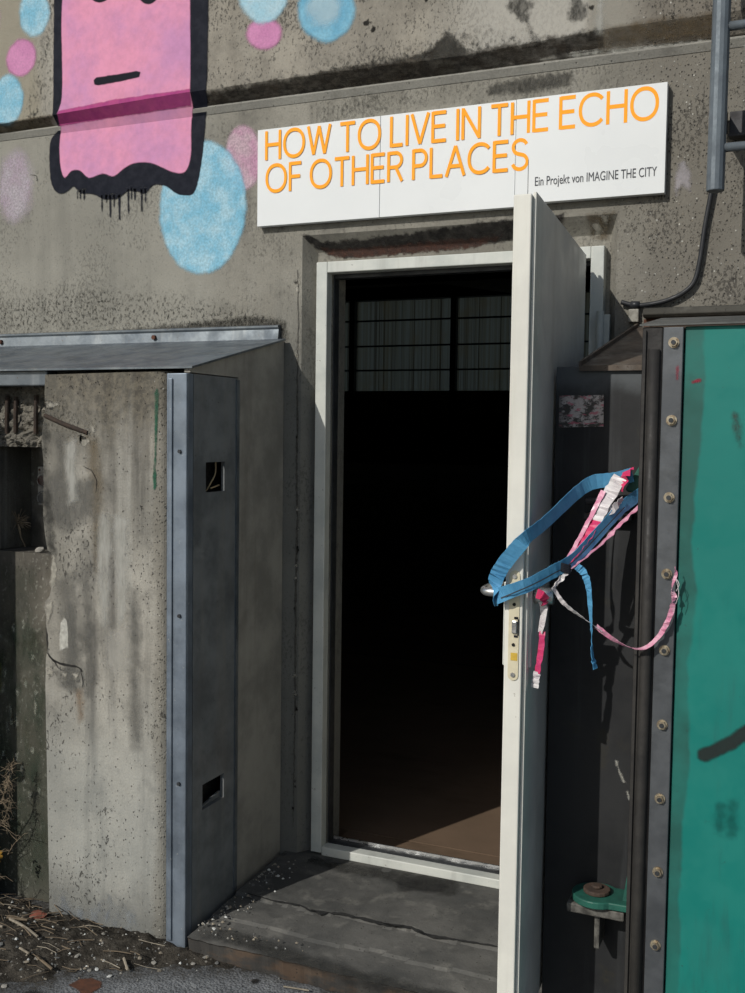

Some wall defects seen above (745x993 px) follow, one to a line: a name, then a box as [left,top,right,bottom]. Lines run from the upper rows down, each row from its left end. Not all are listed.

damp [207,0,712,106]
damp [50,441,92,528]
damp [64,568,95,687]
damp [98,516,136,642]
crack [248,893,498,947]